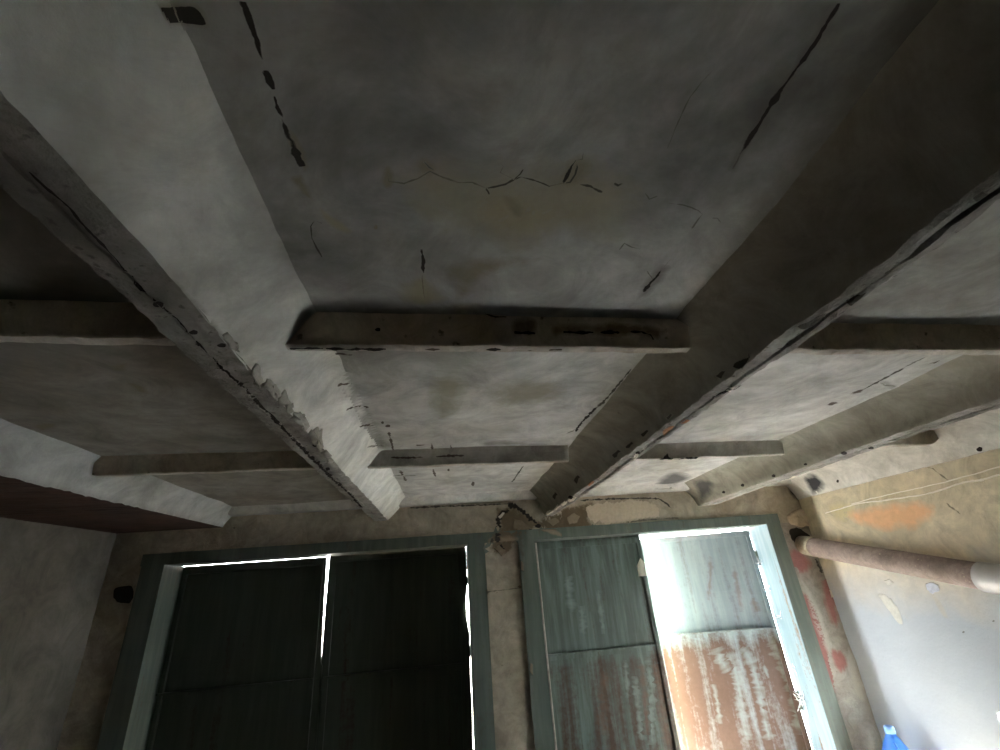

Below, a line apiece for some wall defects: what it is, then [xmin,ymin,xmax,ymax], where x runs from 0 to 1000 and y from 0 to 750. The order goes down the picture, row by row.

crack [378,151,623,221]
crack [408,249,438,309]
crack [619,243,674,303]
spalling [845,291,868,306]
crack [28,172,362,508]
spalling [161,262,332,463]
spalling [715,352,752,379]
flaking render [483,491,680,572]